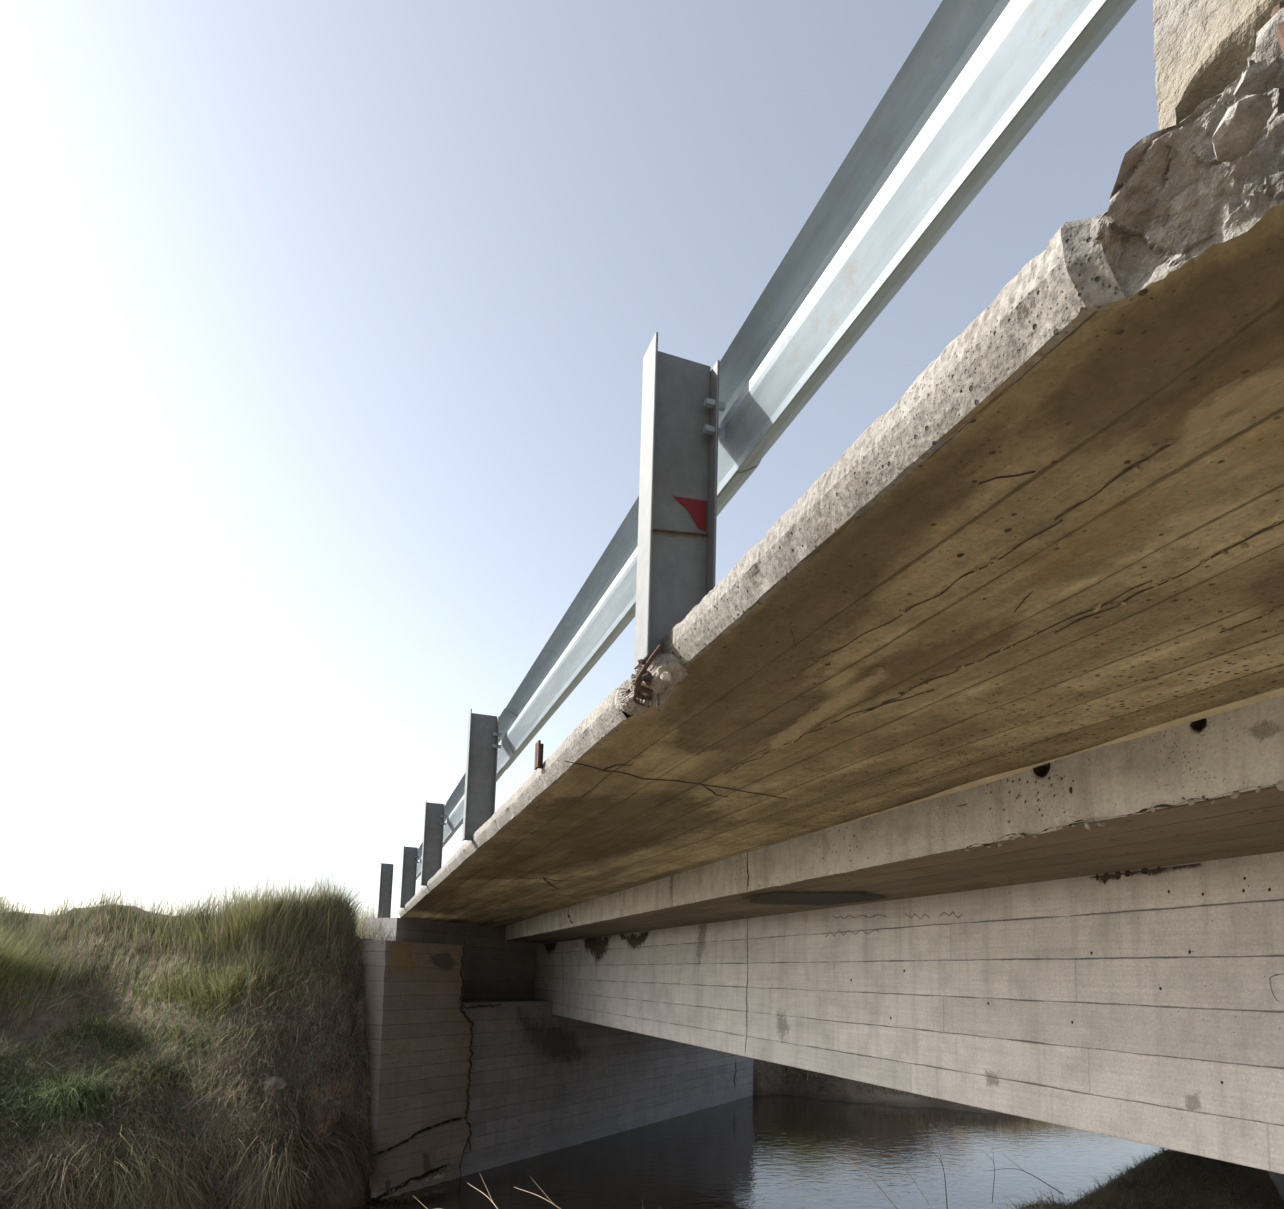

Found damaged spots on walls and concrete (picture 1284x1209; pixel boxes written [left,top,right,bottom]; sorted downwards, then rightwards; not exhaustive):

spalling [1093,2,1284,298]
spalling [614,645,689,715]
crack [366,939,503,1202]